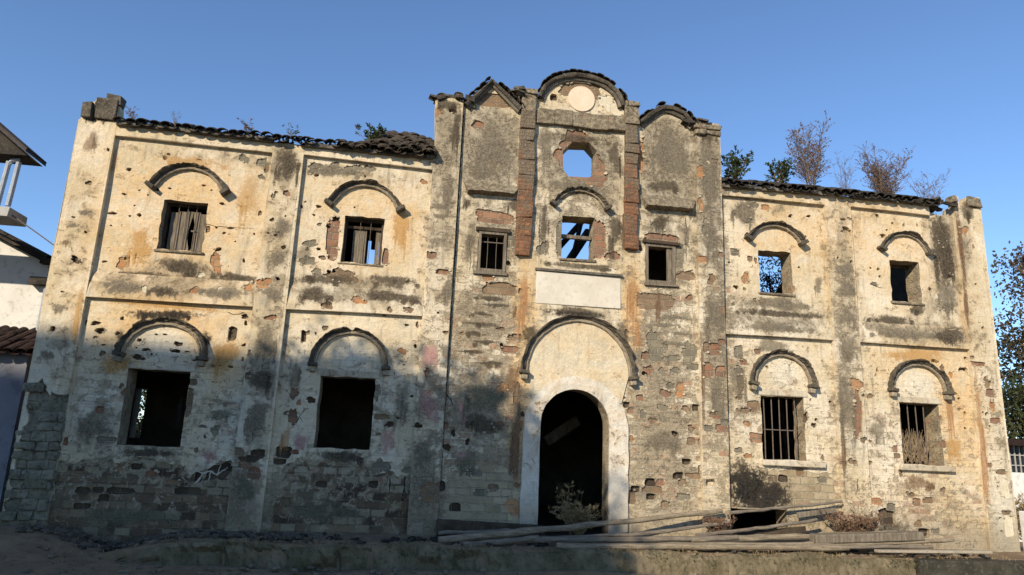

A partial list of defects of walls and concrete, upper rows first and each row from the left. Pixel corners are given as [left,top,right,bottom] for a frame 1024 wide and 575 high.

flaking render [553,128,608,194]
flaking render [190,248,222,294]
flaking render [299,206,368,304]
damp [835,201,973,400]
damp [244,329,277,441]
flaking render [0,379,524,542]
flaking render [623,329,837,507]
damp [839,380,856,474]
flaking render [849,376,873,443]